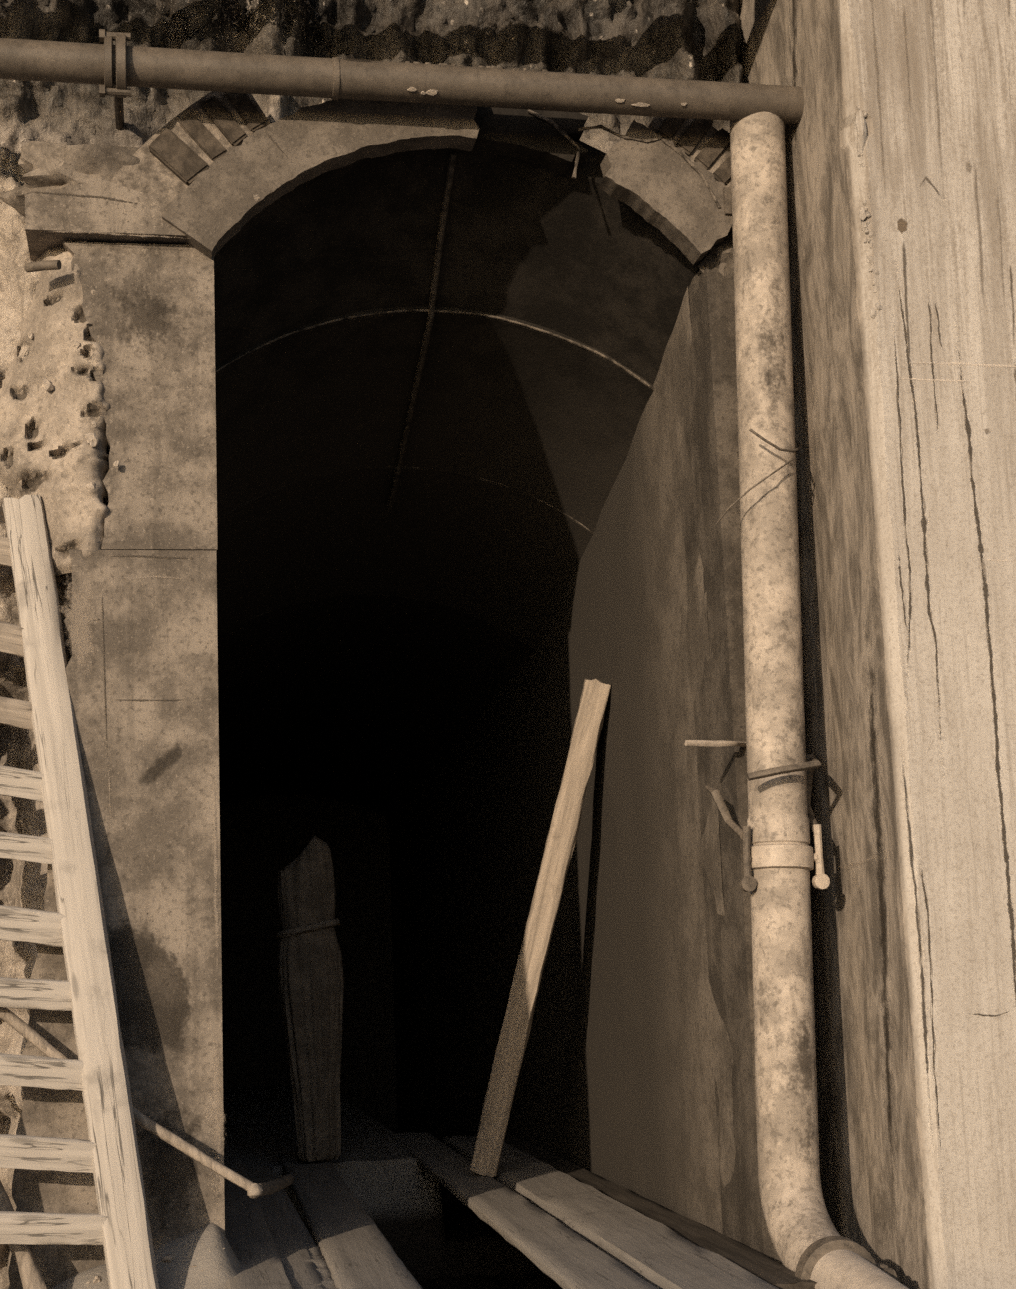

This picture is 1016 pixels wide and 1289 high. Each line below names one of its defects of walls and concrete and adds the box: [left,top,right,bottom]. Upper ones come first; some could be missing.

spalling [0,241,120,575]
spalling [698,232,734,277]
crack [894,279,1016,1017]
crack [902,768,942,1164]